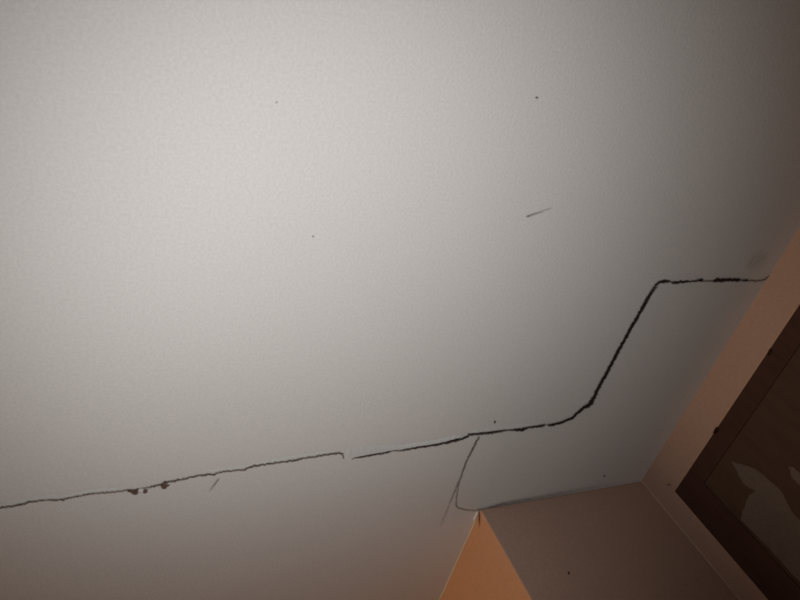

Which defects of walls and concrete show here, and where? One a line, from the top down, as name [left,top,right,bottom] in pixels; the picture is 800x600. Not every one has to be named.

crack [0,276,769,509]